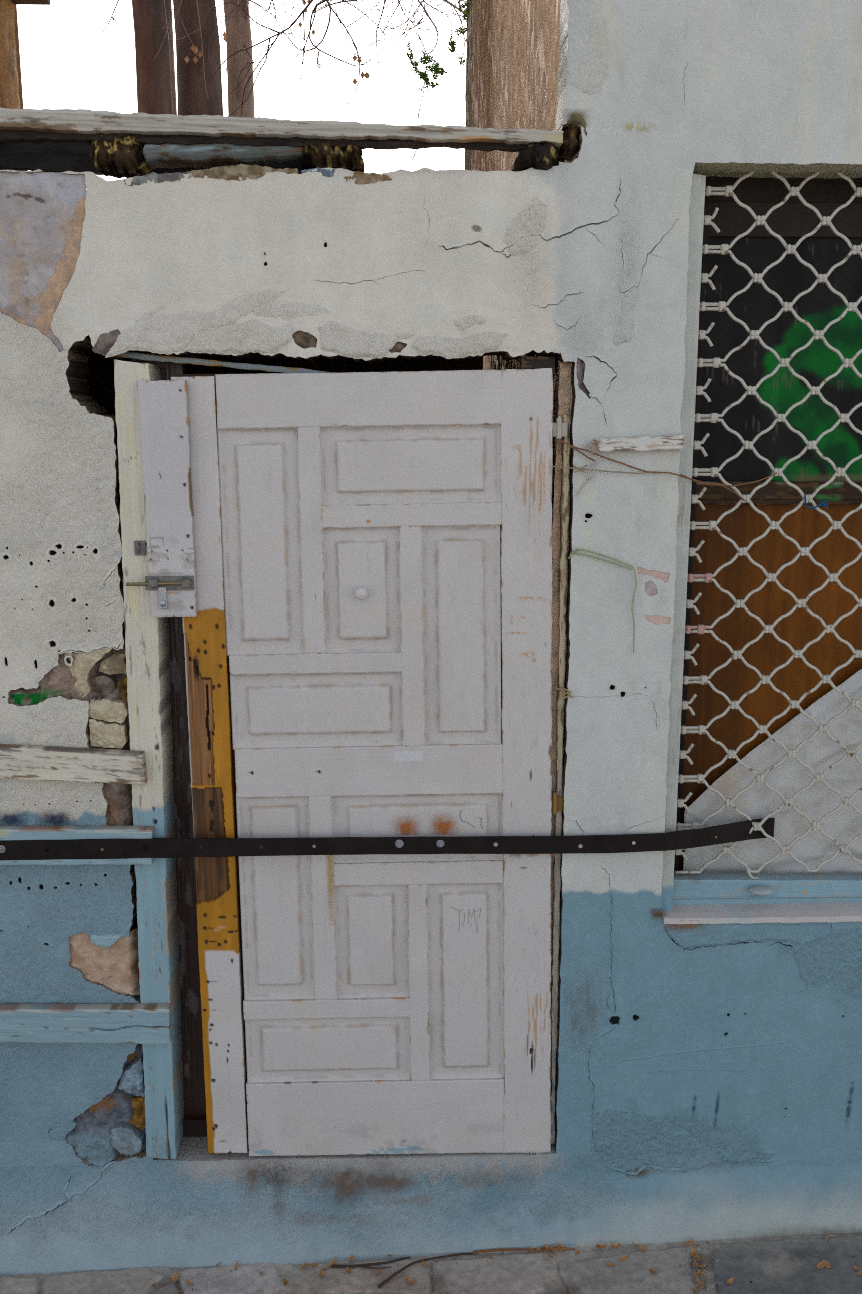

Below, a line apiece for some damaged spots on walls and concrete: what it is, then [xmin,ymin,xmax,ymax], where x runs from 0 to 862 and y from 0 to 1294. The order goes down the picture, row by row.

peeling [0,171,87,352]
crack [311,179,680,427]
spalling [10,648,130,750]
rust [435,821,450,834]
spalling [54,920,140,995]
crack [586,865,686,1175]
spalling [48,1044,146,1167]
crack [6,1161,116,1236]